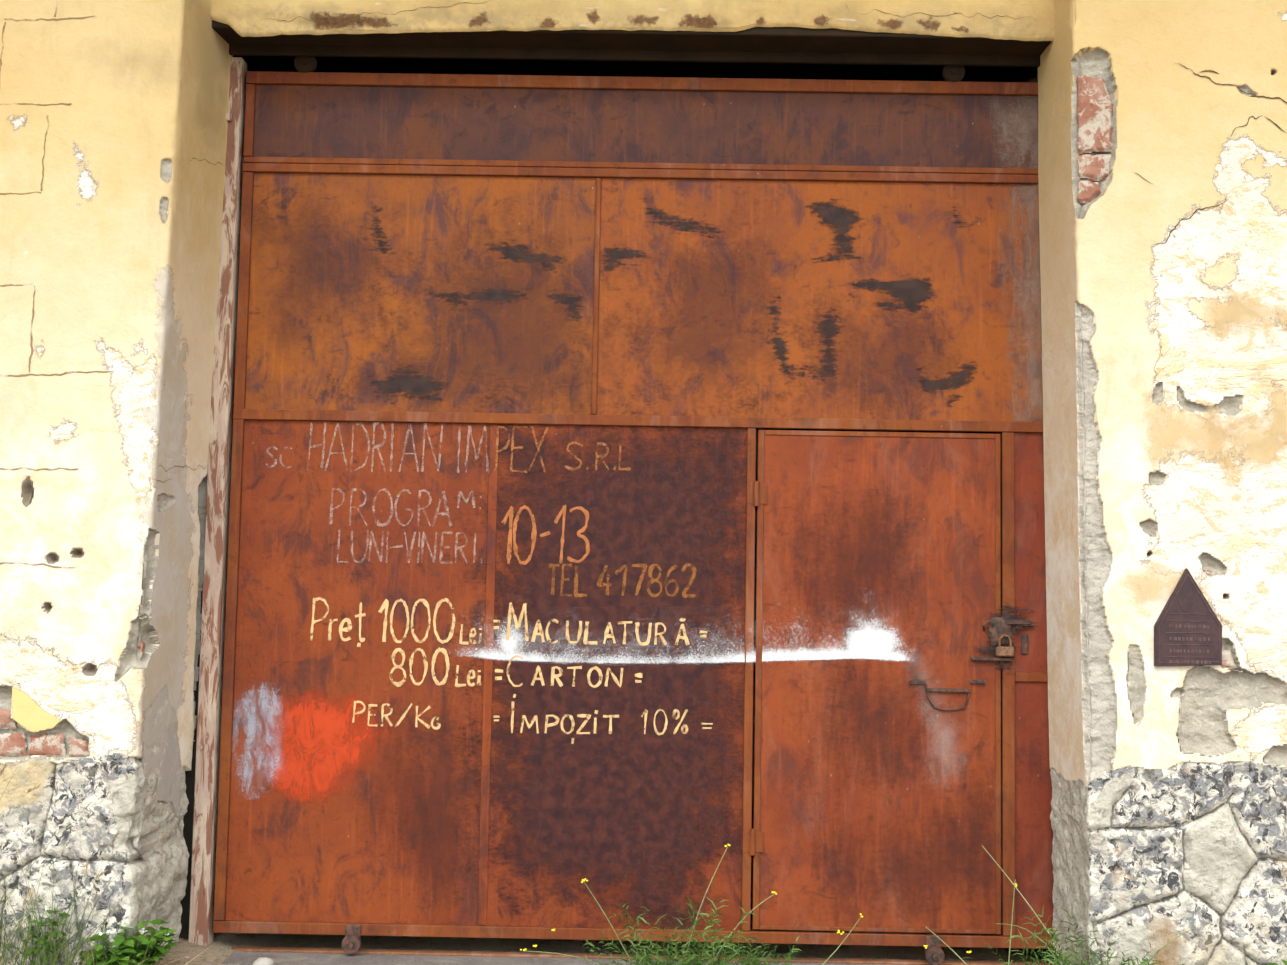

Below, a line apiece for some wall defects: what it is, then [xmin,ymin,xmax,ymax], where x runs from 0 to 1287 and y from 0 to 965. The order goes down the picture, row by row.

corrosion [311,12,394,29]
corrosion [679,15,717,28]
spalling [1071,48,1117,219]
crack [1178,63,1287,136]
corrosion [806,199,861,262]
corrosion [850,278,932,315]
corrosion [767,297,841,379]
corrosion [916,362,977,407]
peeling [1139,133,1287,767]
flaking render [0,264,207,860]
spalling [1075,301,1146,782]
corrosion [465,426,757,929]